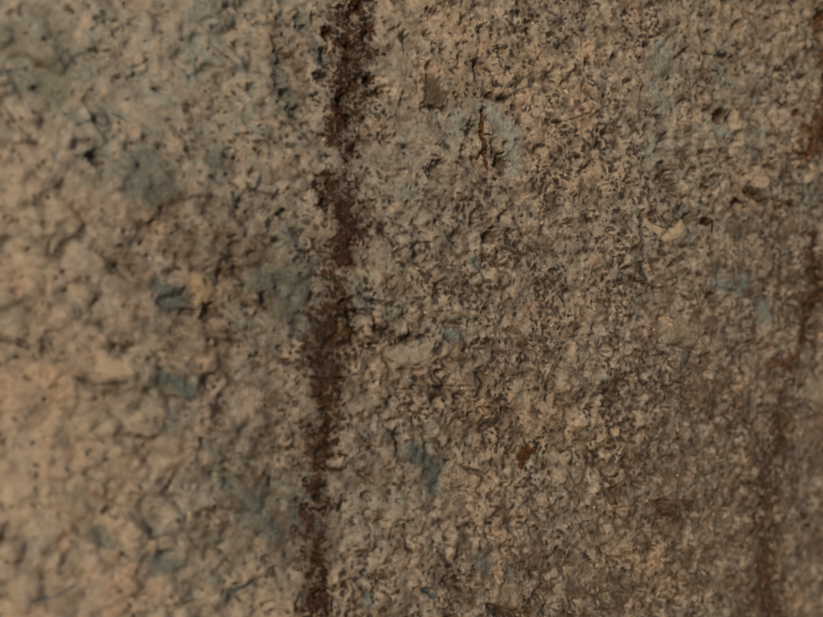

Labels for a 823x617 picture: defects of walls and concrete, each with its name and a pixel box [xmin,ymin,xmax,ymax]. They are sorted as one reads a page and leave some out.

rust [287,0,391,617]